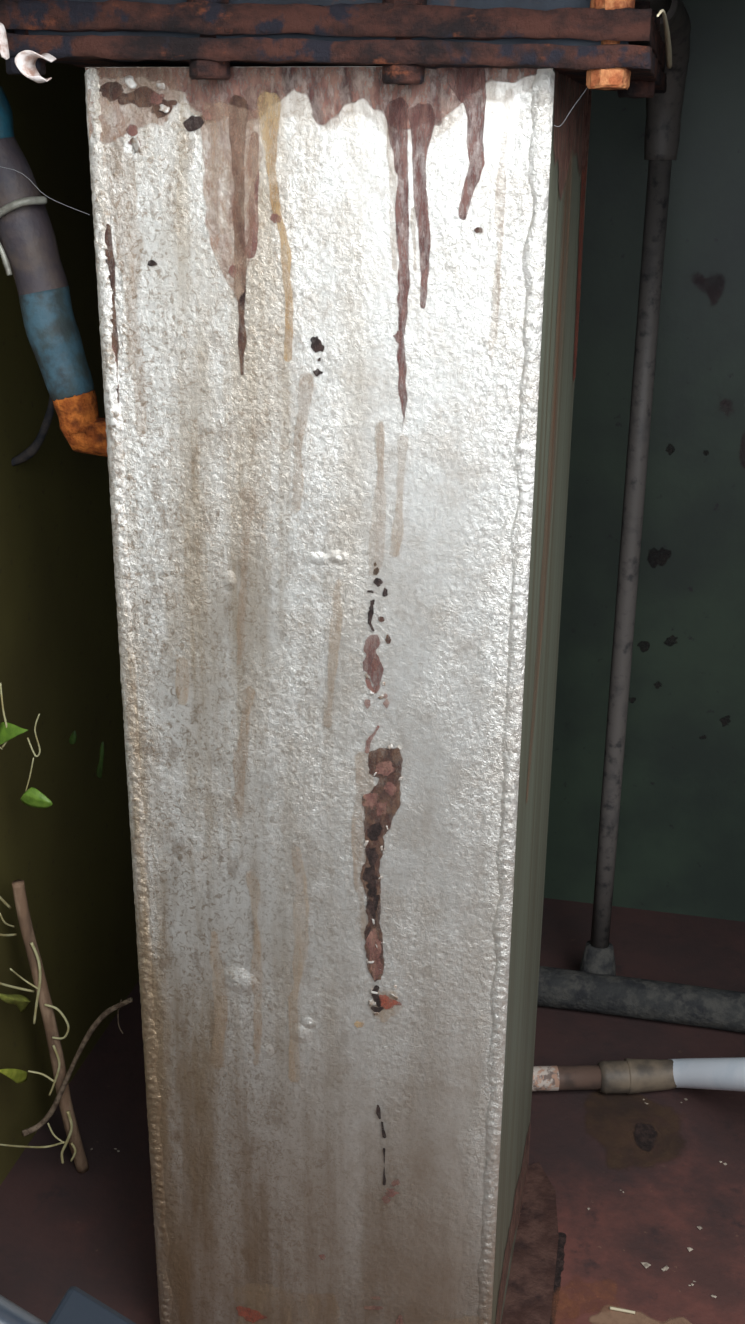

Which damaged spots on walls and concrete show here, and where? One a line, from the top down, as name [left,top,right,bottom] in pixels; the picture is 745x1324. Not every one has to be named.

rust [85,67,592,420]
rust [496,1122,531,1324]